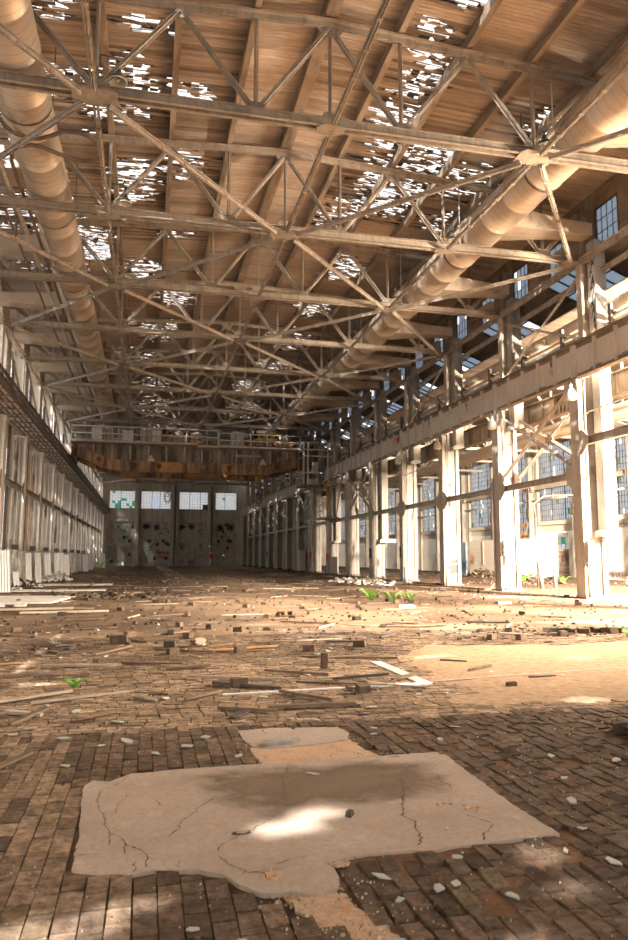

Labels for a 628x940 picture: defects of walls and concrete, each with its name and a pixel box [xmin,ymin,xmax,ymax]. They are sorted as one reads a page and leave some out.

crack [83,777,180,871]
crack [399,777,423,845]